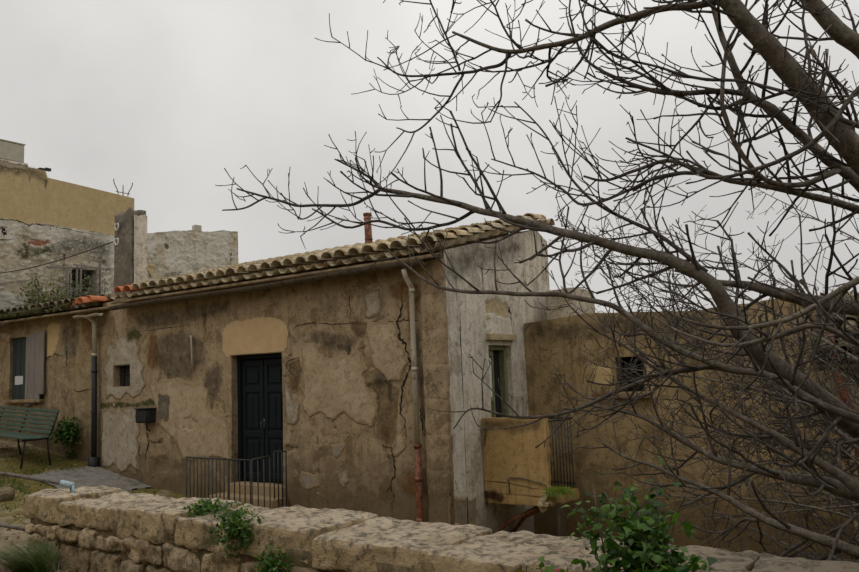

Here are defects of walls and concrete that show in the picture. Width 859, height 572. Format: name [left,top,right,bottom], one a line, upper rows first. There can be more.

peeling [282,289,409,458]
crack [295,289,423,513]